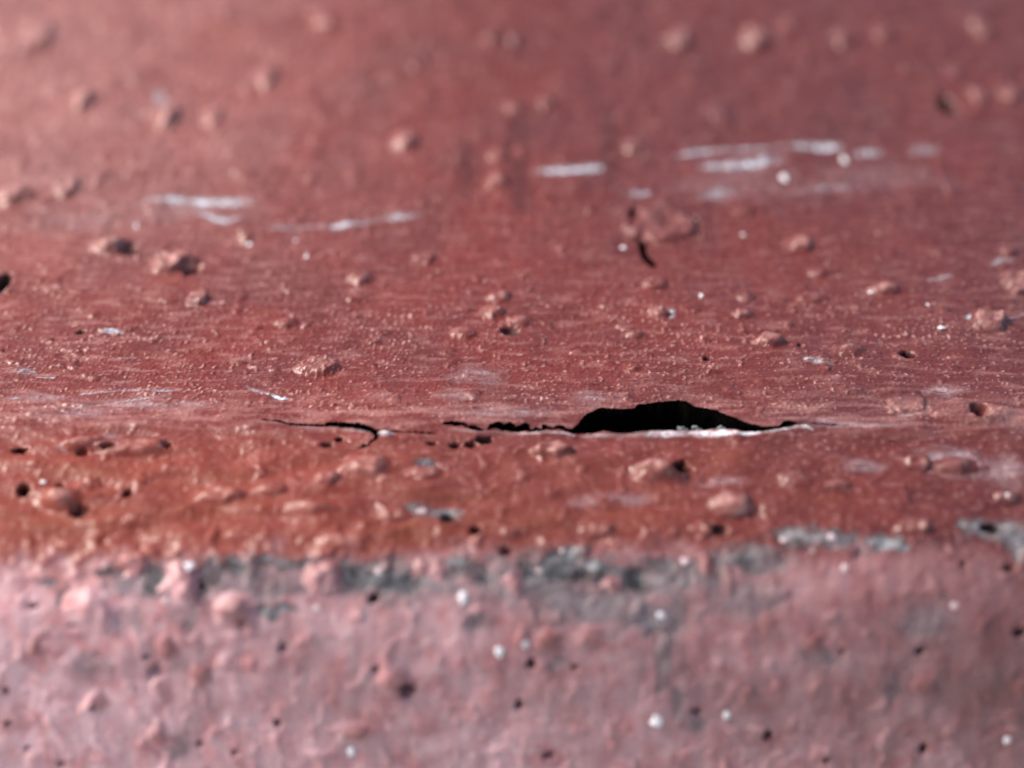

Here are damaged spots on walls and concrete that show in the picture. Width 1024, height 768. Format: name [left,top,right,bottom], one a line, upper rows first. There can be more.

crack [261,400,848,449]